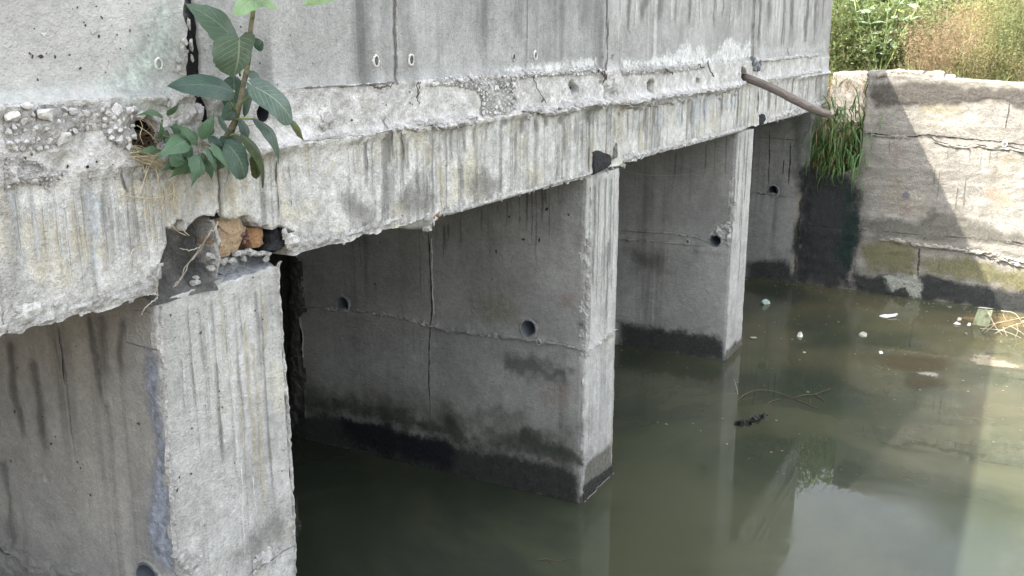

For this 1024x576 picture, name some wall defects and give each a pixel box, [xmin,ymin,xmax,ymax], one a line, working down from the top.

damp [389,131,408,200]
crack [867,97,1024,150]
damp [593,180,615,304]
damp [748,166,1024,313]
crack [426,234,434,418]
spalling [0,213,404,576]
damp [291,387,613,504]